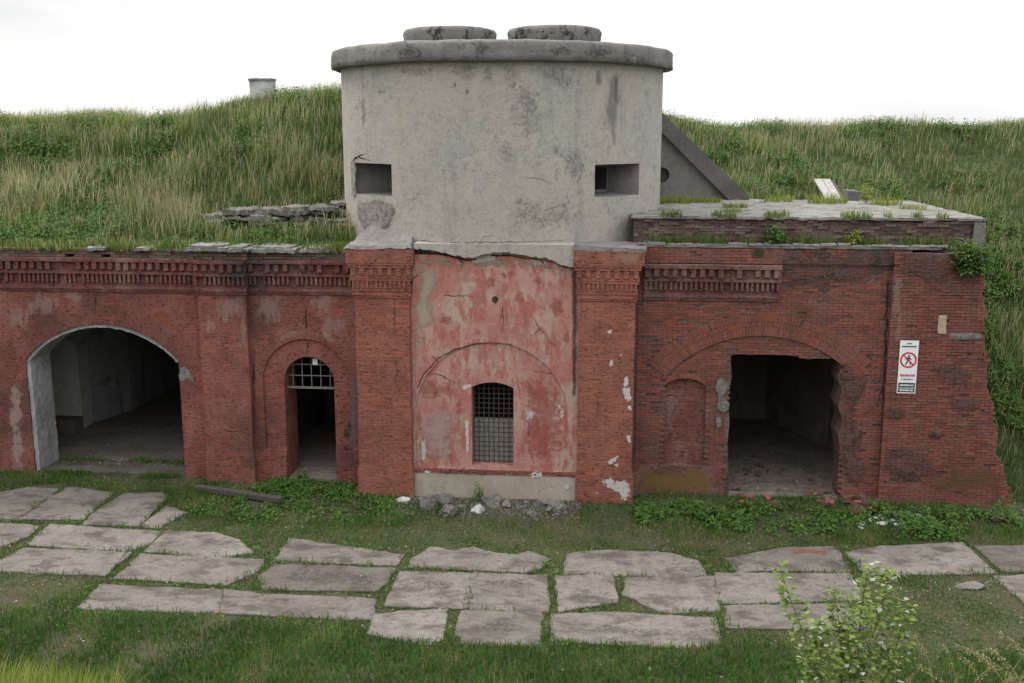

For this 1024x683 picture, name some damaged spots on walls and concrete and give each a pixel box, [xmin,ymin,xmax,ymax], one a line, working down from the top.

spalling [350,160,395,229]
crack [394,236,574,320]
peeling [413,259,469,474]
crack [395,306,557,389]
peeling [622,377,632,410]
peeling [715,377,730,428]
peeling [596,455,631,501]